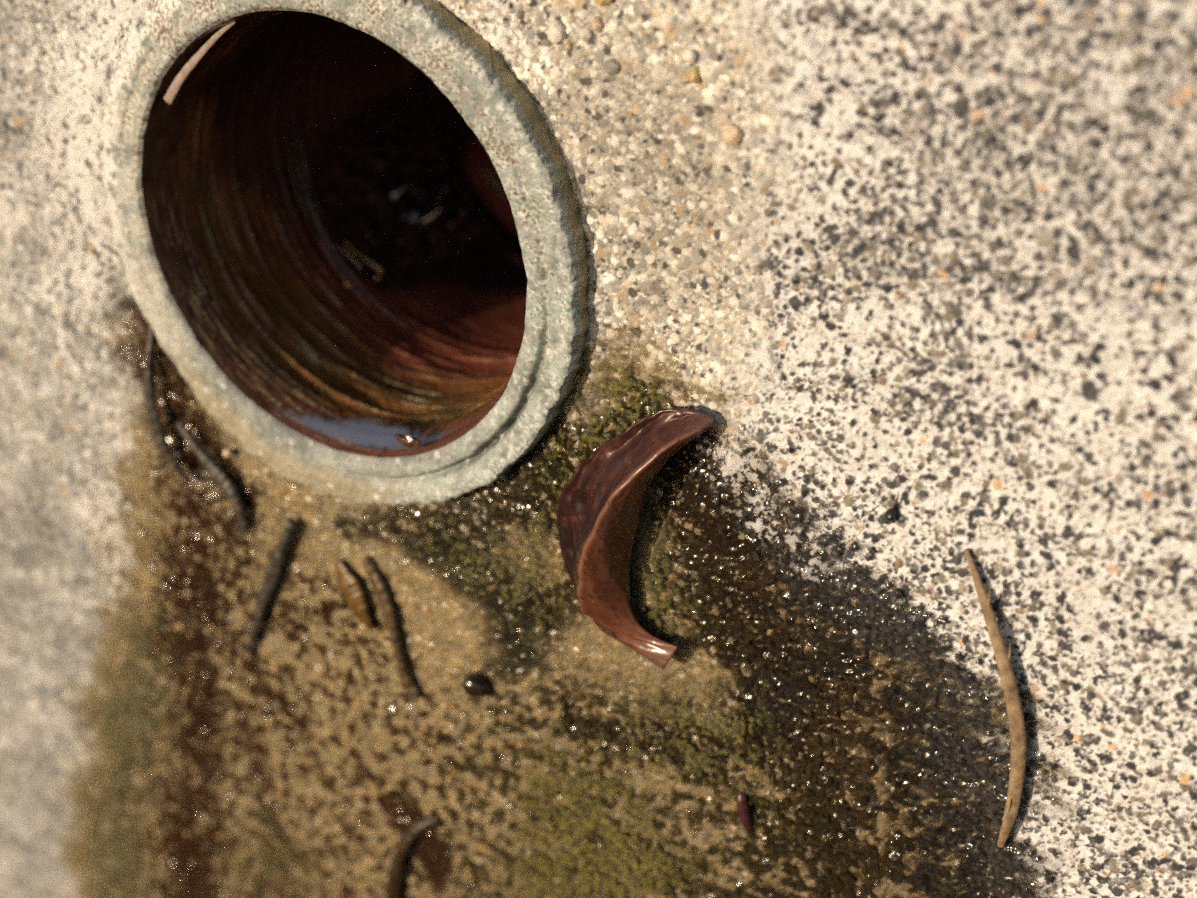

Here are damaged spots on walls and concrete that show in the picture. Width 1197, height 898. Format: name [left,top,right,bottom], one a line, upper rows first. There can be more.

damp [63,328,1063,898]